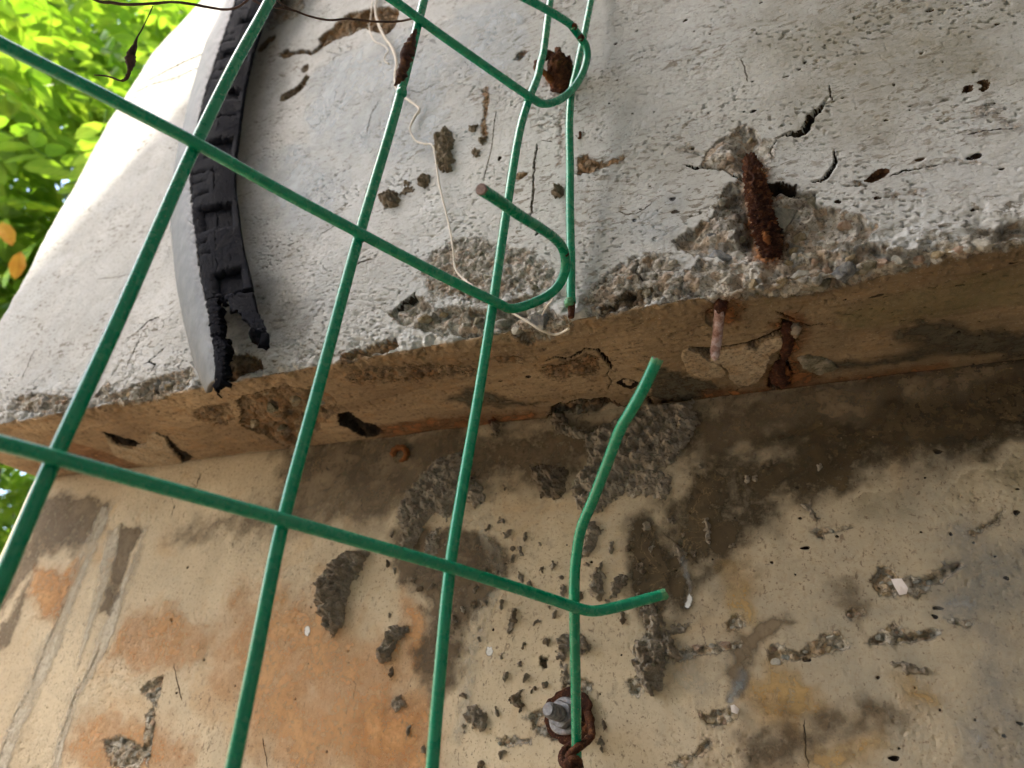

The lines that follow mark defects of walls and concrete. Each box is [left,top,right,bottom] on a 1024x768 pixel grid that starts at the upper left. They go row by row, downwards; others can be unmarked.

crack [767,85,838,198]
rust [741,152,788,269]
spalling [583,124,1024,319]
spalling [388,236,574,344]
rust [769,314,818,390]
spalling [547,397,627,418]
leakage [627,321,1024,616]
spalling [869,562,964,598]
leakage [0,507,147,768]
spalling [104,675,164,768]
spalling [625,677,643,698]
spalling [770,630,850,665]